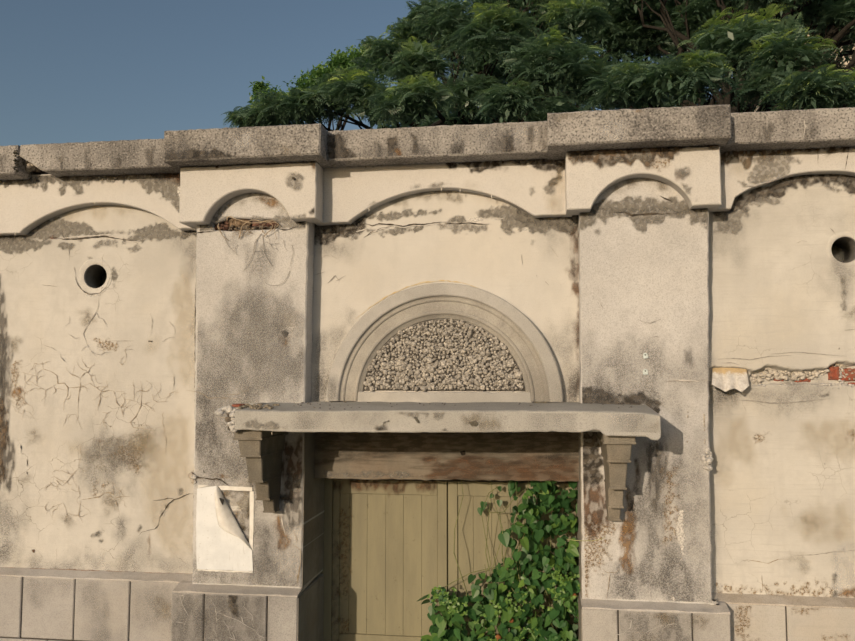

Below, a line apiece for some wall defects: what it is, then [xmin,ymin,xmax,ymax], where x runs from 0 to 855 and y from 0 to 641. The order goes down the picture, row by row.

peeling [0,217,118,296]
peeling [0,150,180,212]
peeling [123,223,197,251]
peeling [314,167,708,245]
damp [0,294,14,490]
crack [14,298,248,521]
crack [727,352,837,365]
spalling [712,364,855,392]
crack [138,470,229,534]
damp [633,444,693,601]
rust [716,581,855,597]